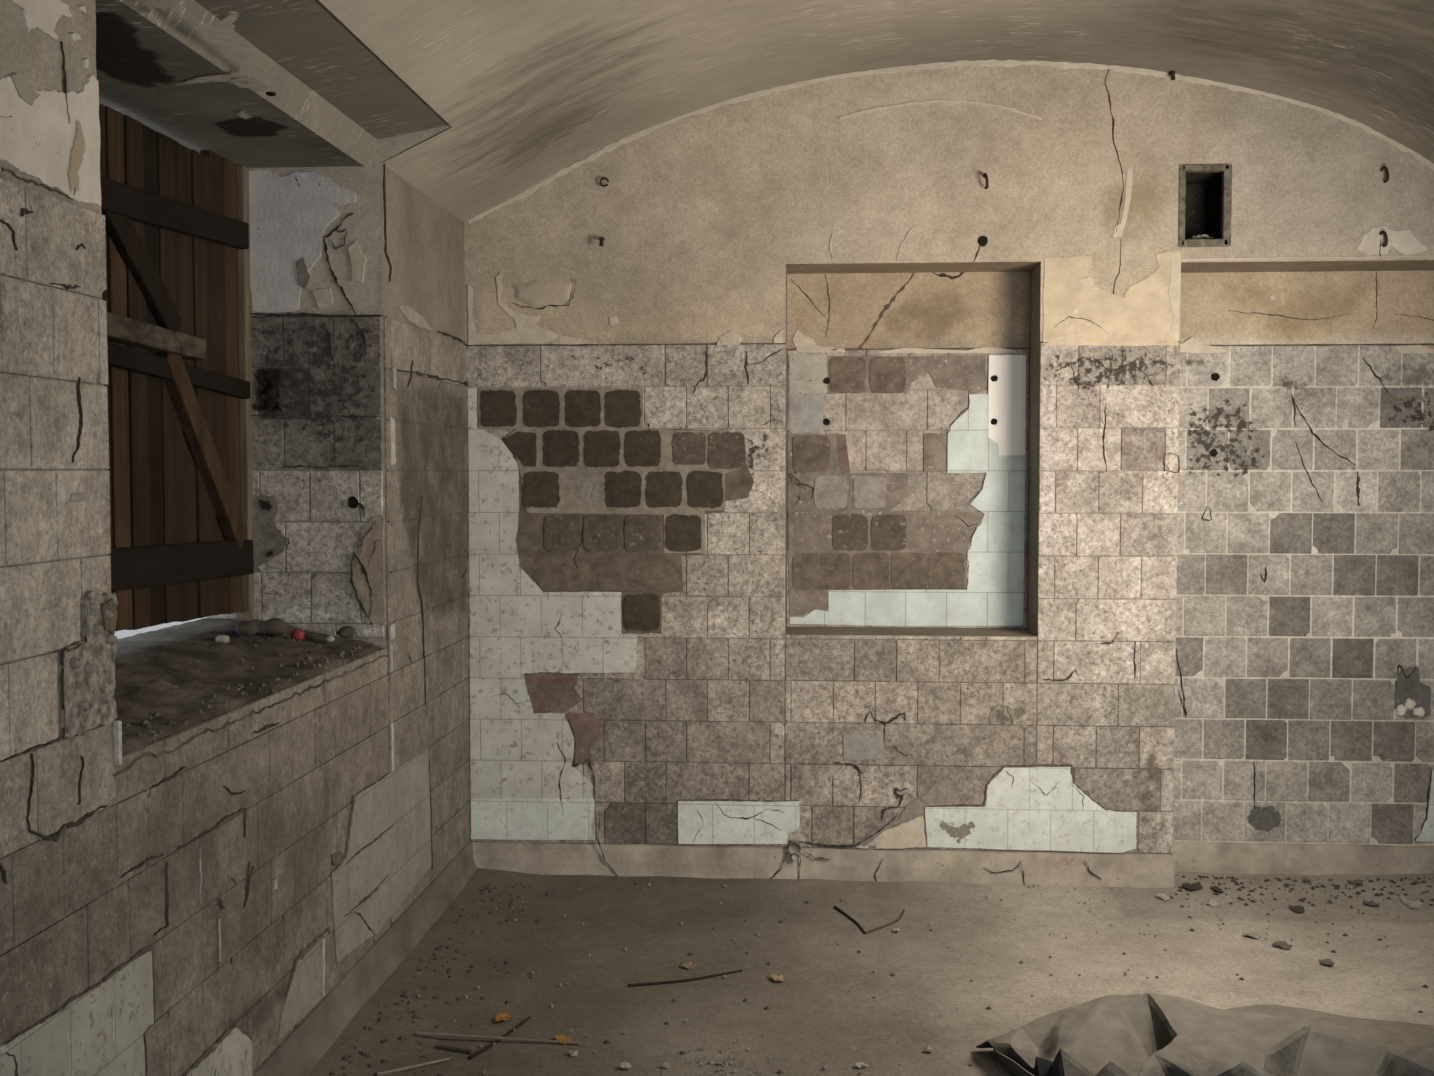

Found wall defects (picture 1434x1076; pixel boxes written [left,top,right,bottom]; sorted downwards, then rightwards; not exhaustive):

flaking render [0,0,101,206]
flaking render [249,169,356,313]
crack [793,232,833,333]
crack [860,227,988,349]
crack [1105,69,1124,294]
flaking render [1043,226,1434,354]
spalling [774,330,1026,626]
water stain [1185,399,1267,479]
spalling [468,388,754,840]
crack [0,737,108,841]
peeling [678,764,1137,853]
crack [0,863,8,884]